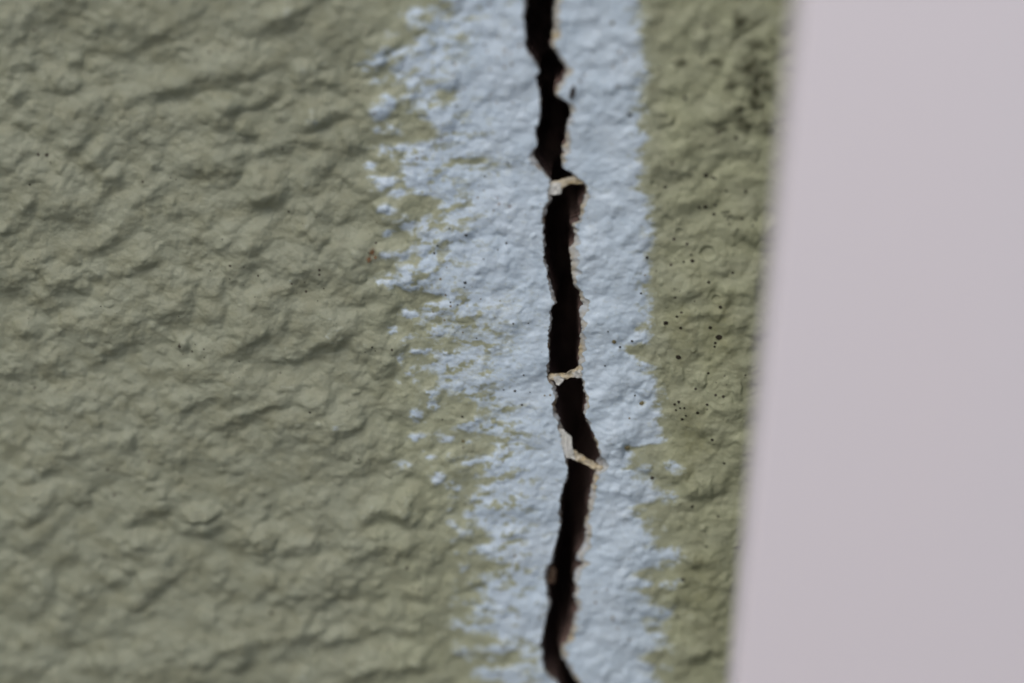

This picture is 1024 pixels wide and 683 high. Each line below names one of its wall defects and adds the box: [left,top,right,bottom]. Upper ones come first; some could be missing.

crack [521,0,609,683]